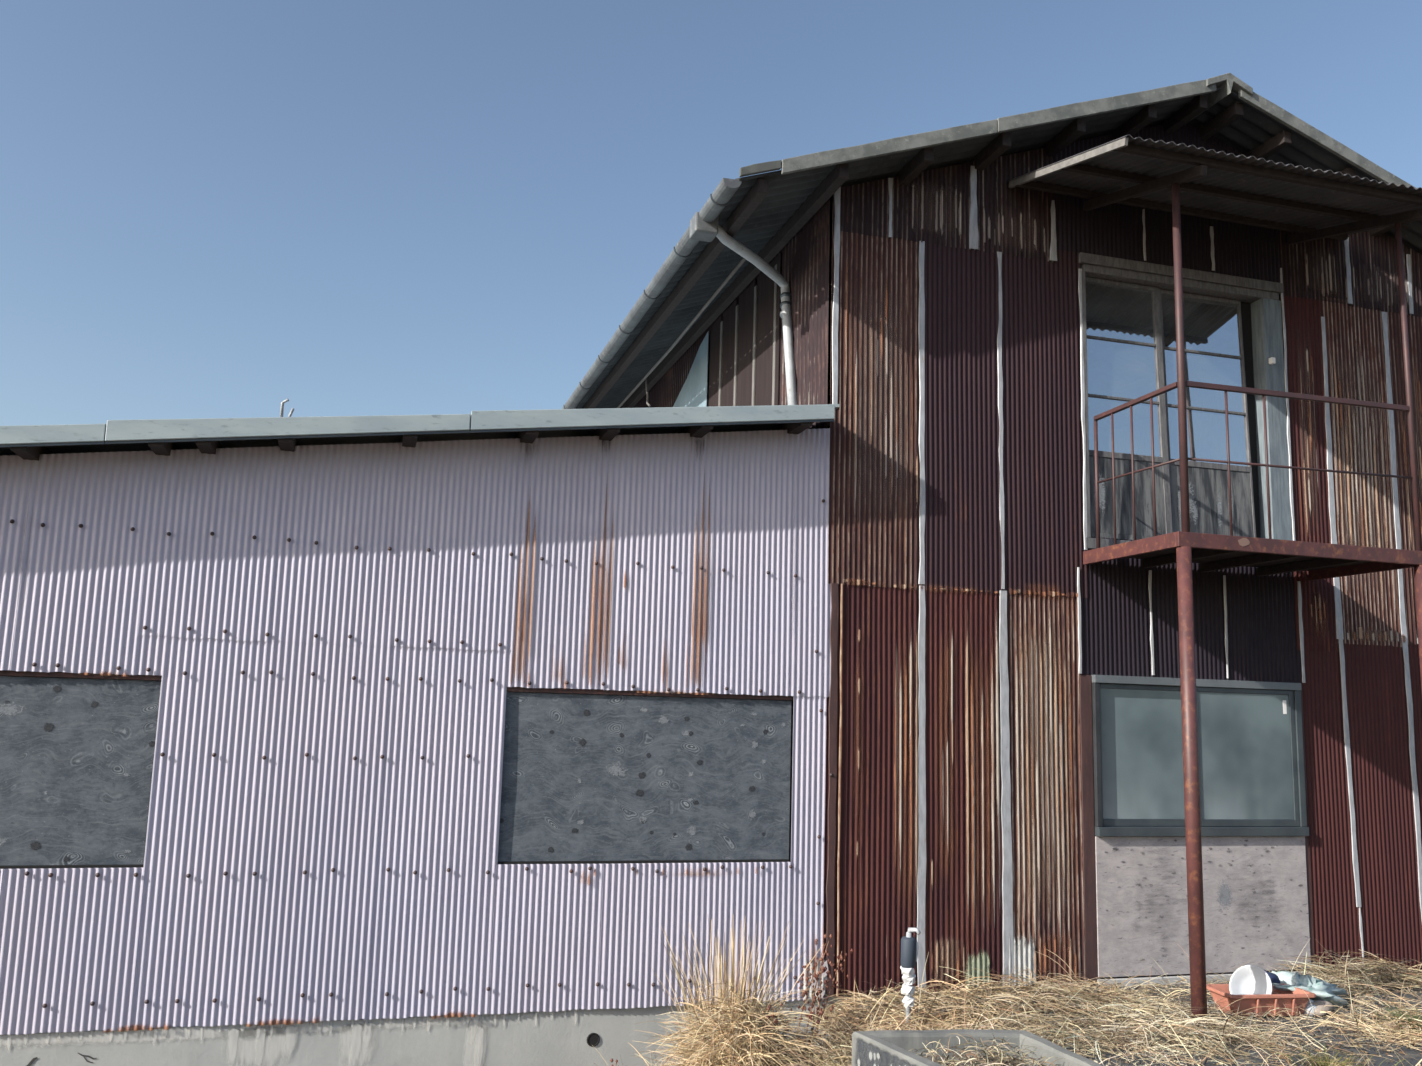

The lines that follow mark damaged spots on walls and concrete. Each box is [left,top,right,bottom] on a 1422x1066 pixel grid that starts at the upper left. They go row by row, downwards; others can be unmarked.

rust [912,184,962,236]
rust [983,207,1046,252]
rust [846,264,918,503]
rust [1300,350,1318,531]
rust [1332,354,1393,549]
rust [511,503,536,686]
rust [583,493,626,685]
rust [663,491,710,695]
rust [894,644,933,886]
rust [943,627,1077,981]
water stain [0,1010,577,1066]
rust [931,940,965,980]